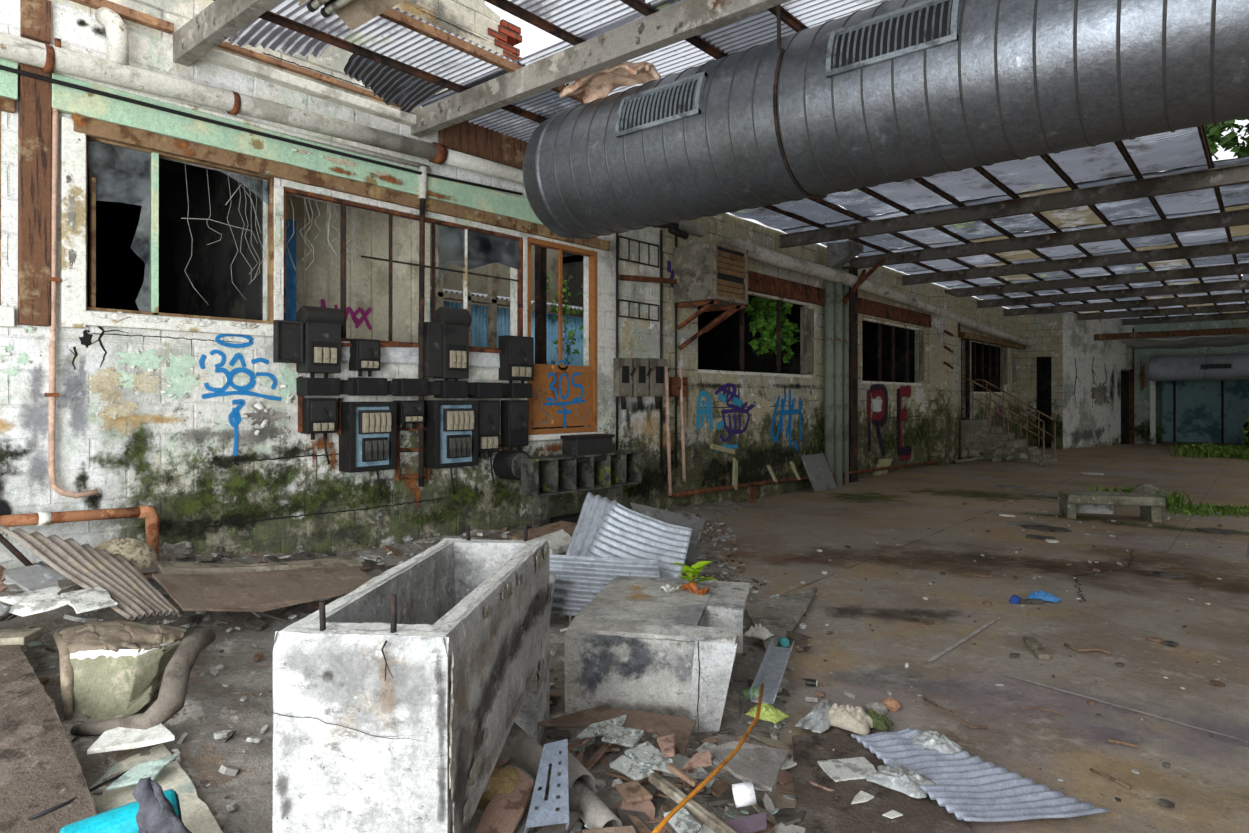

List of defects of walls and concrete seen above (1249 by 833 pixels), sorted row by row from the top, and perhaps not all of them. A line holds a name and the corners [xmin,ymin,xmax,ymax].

peeling [0,345,33,377]
peeling [1090,382,1110,406]
damp [186,429,312,469]
damp [76,469,102,510]
damp [282,482,304,518]
damp [138,511,266,540]
damp [575,586,672,694]
crack [272,712,420,741]
damp [437,583,553,833]
damp [603,704,689,719]